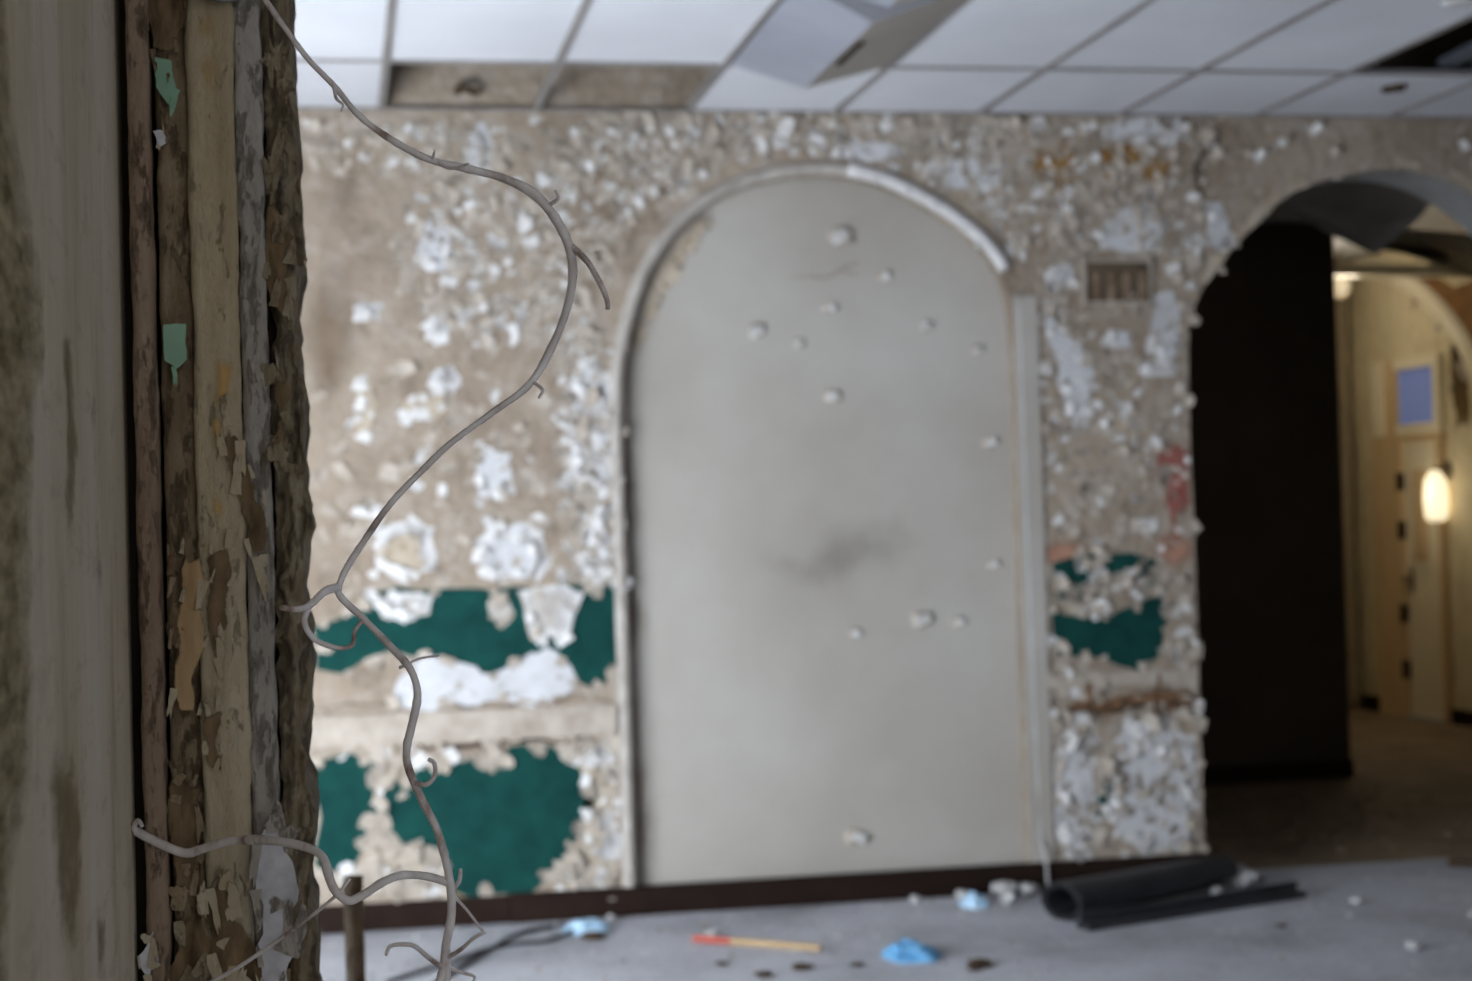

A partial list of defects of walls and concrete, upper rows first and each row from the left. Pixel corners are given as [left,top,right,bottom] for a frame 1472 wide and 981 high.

peeling [147,0,187,151]
peeling [1242,120,1324,166]
peeling [137,38,1309,981]